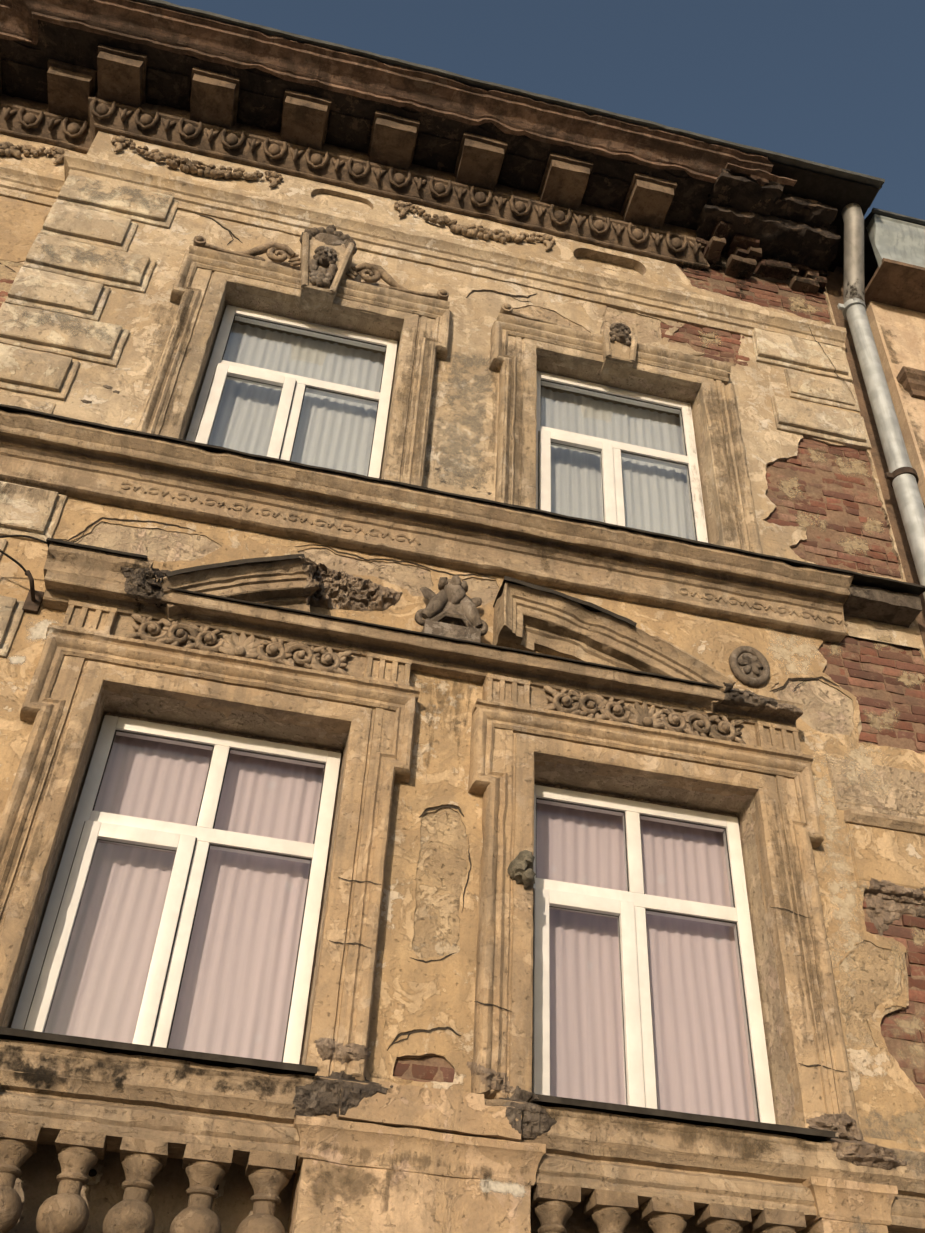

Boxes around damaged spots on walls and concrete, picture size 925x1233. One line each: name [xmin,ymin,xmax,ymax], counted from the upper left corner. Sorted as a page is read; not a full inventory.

flaking render [678,266,832,325]
flaking render [512,306,750,366]
crack [55,512,197,542]
flaking render [763,435,901,579]
flaking render [772,627,925,794]
crack [384,1020,462,1051]
crack [474,1001,512,1012]
flaking render [839,895,925,1148]
flaking render [390,1052,454,1085]